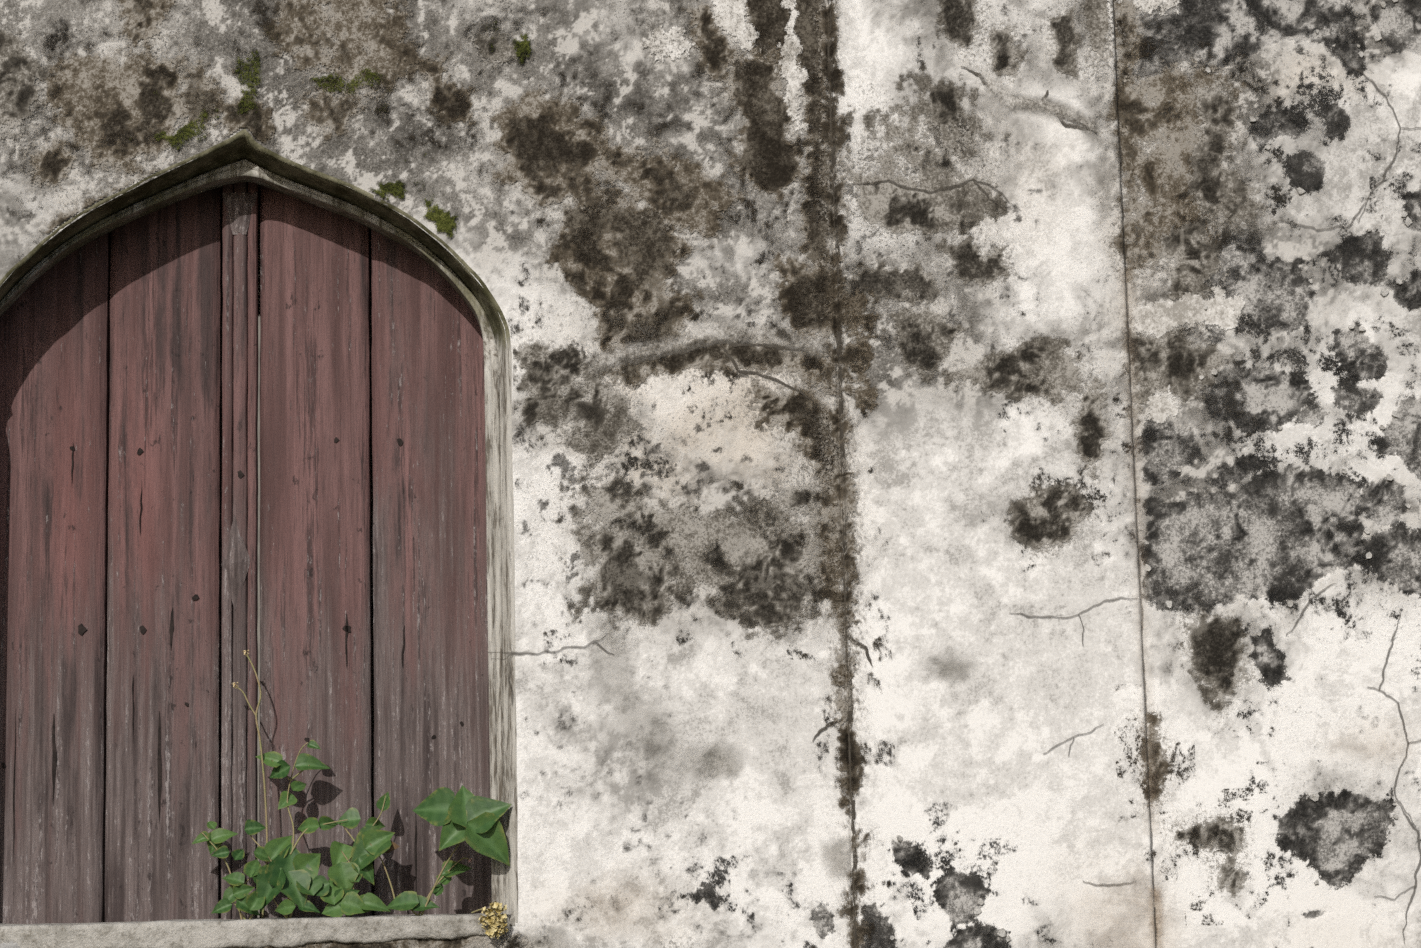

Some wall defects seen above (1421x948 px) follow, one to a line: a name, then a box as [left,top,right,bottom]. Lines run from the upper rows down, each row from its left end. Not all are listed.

leakage [0,0,278,242]
crack [1243,55,1421,231]
leakage [248,0,1286,948]
crack [1367,613,1421,943]
flaking render [462,924,548,948]
peeling [658,855,754,928]
peeling [778,872,835,948]
peeling [859,802,1017,948]